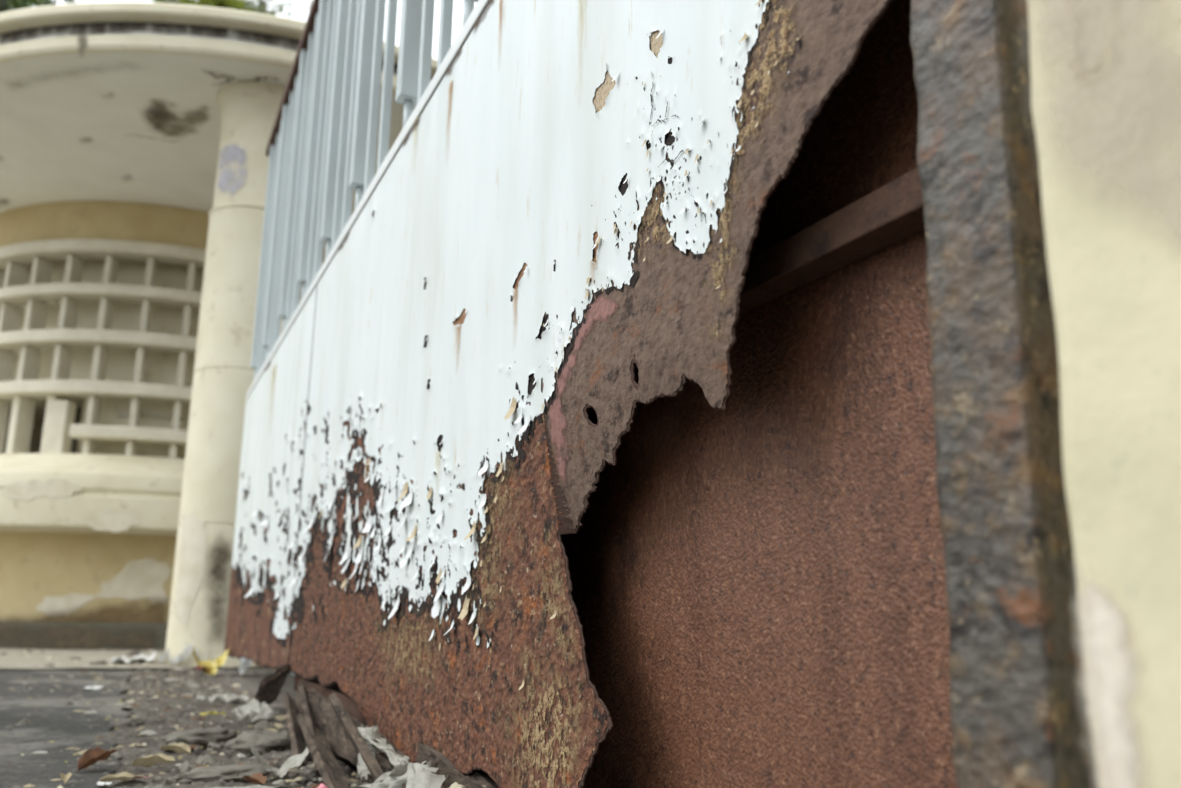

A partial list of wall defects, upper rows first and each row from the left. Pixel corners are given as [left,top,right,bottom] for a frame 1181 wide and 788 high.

peeling [649,26,673,64]
peeling [593,70,618,113]
leakage [147,101,207,136]
peeling [619,173,628,196]
peeling [510,263,527,302]
peeling [452,308,467,325]
peeling [527,373,536,395]
rust [224,0,887,788]
peeling [36,510,207,628]
spalling [1080,586,1139,788]